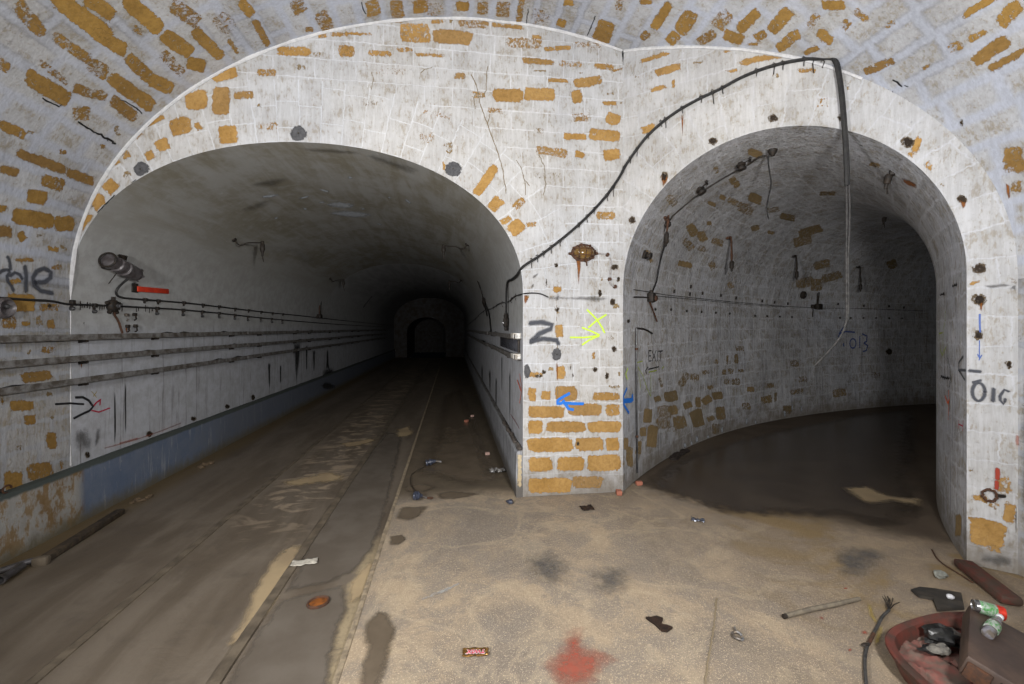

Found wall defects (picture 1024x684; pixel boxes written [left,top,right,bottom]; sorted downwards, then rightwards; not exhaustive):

crack [471,66,546,195]
peeling [598,265,620,308]
water stain [114,387,126,435]
peeling [517,346,807,494]
peeling [955,476,1016,553]